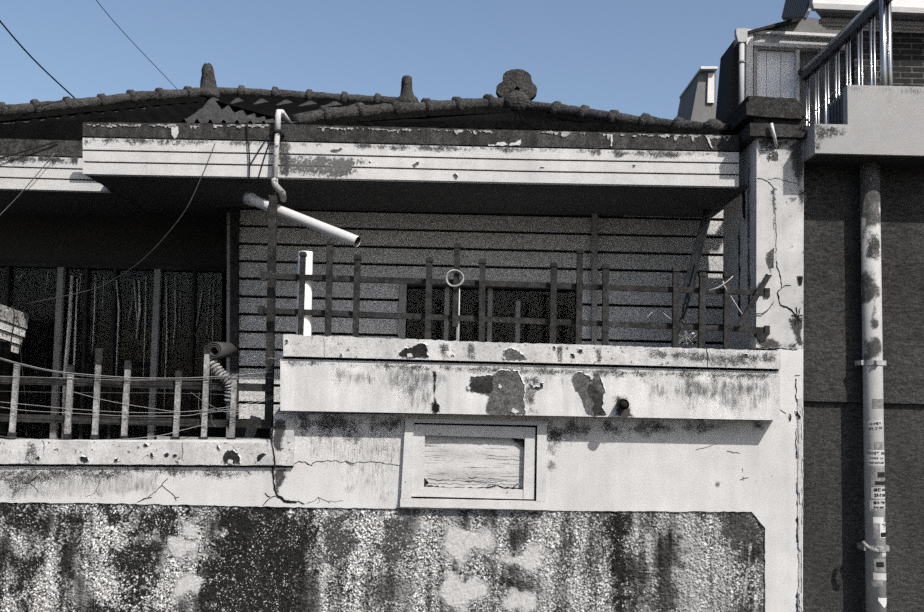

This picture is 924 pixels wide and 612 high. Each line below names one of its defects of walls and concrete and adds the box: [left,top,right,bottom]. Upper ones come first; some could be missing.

peeling [433,129,521,146]
peeling [599,133,730,148]
crack [757,178,803,325]
peeling [397,342,429,358]
peeling [466,347,544,415]
peeling [572,371,607,417]
water stain [377,317,803,413]
crack [263,432,399,505]
water stain [0,547,45,612]
water stain [98,504,182,586]
water stain [194,505,359,612]
water stain [603,511,656,612]